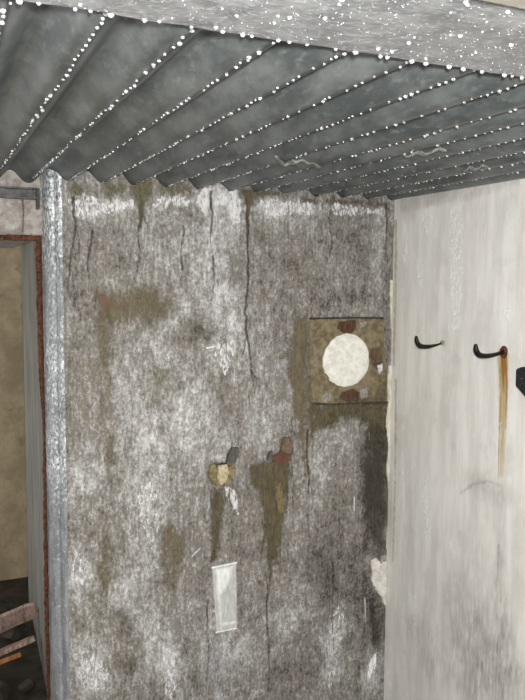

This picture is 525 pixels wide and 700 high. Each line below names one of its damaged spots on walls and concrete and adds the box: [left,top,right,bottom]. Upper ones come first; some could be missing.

crack [67,196,93,285]
crack [207,191,215,234]
crack [242,201,256,392]
rust [499,355,507,441]
water stain [210,487,230,561]
spalling [208,462,239,515]
water stain [251,461,289,581]